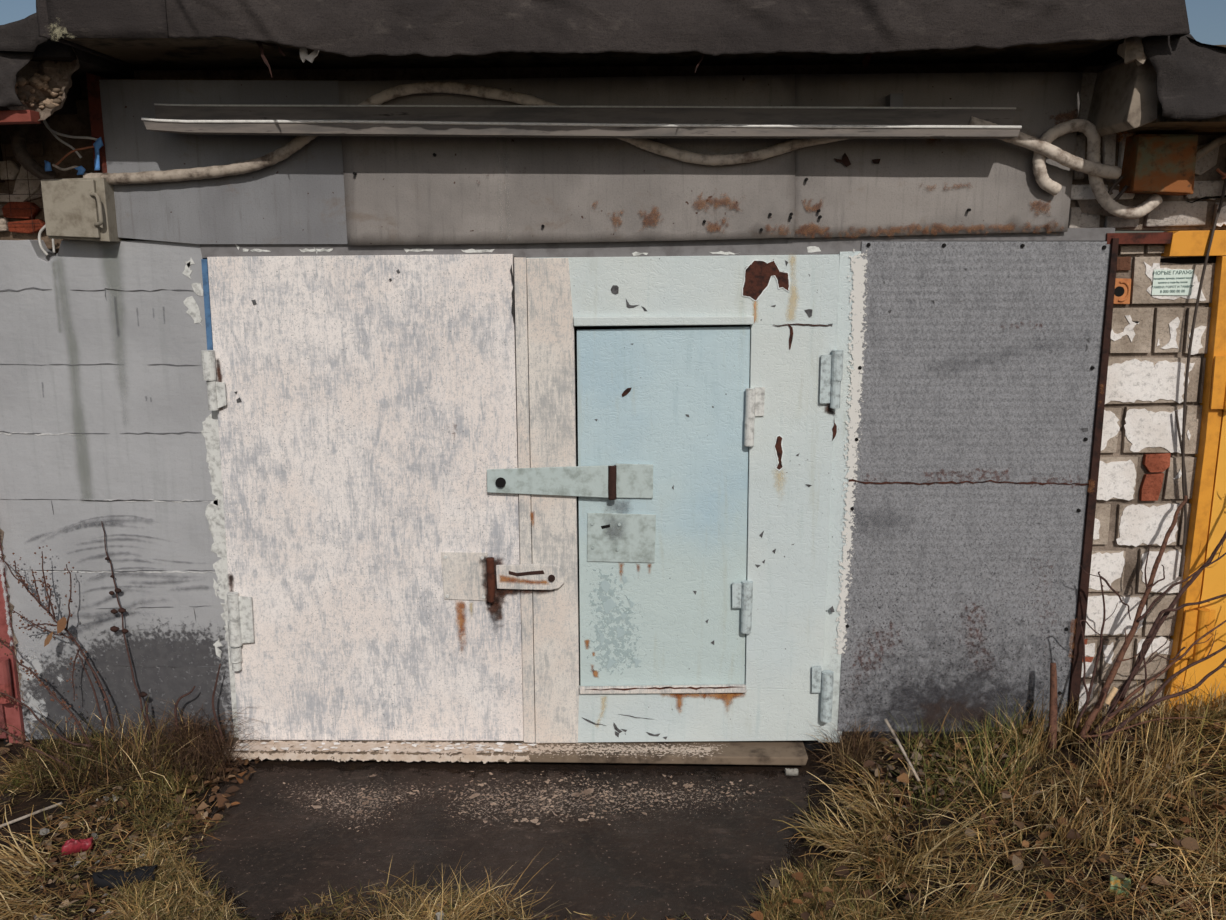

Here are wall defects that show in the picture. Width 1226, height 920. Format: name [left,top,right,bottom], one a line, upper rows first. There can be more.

spalling [7,47,80,121]
corrosion [694,193,739,232]
corrosion [766,200,829,238]
corrosion [846,200,1063,237]
peeling [1143,261,1206,301]
peeling [1078,315,1207,711]
corrosion [457,557,554,638]
damp [19,620,233,743]
corrosion [585,640,744,709]